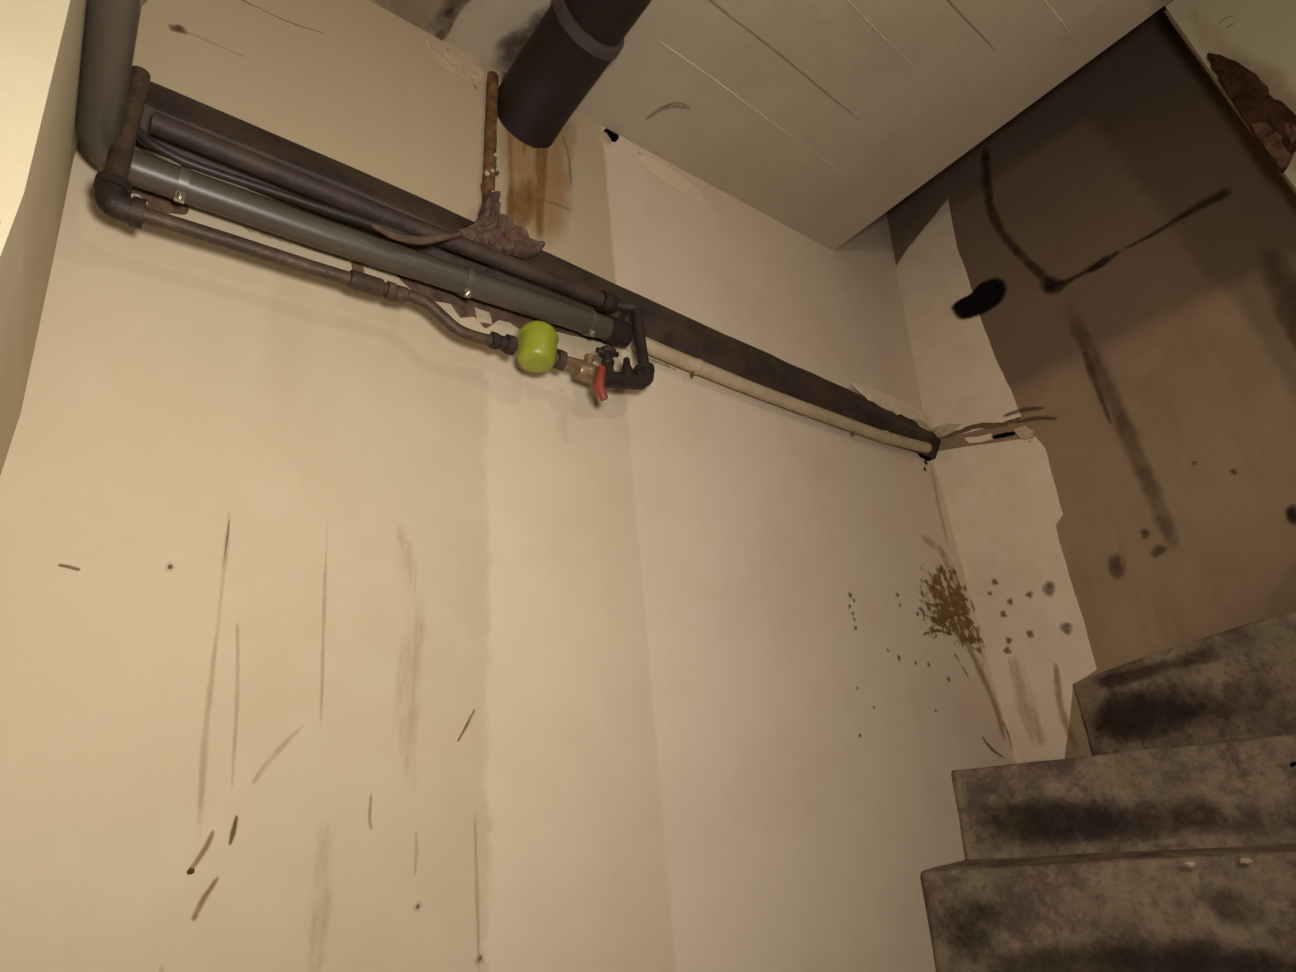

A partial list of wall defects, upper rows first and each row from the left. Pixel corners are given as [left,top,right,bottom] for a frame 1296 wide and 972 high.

crack [242,0,325,34]
water stain [436,0,469,40]
spalling [1207,53,1296,173]
rust [458,131,565,259]
spalling [851,382,1057,444]